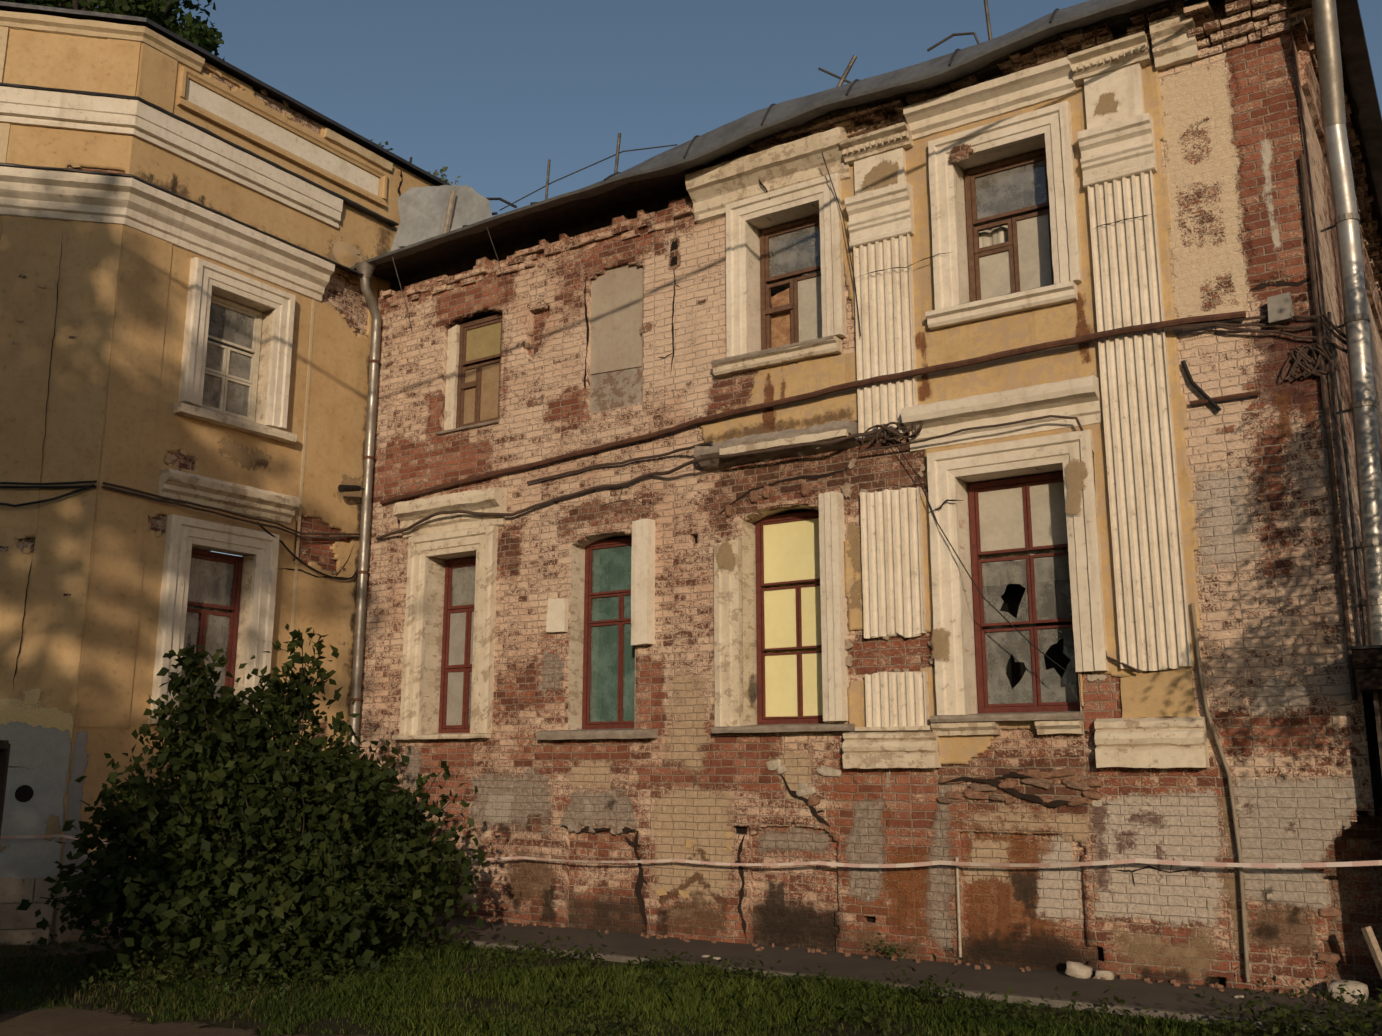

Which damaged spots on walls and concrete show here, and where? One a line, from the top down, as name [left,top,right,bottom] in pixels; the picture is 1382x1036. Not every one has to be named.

flaking render [1225,32,1315,285]
crack [659,268,679,375]
peeling [0,687,73,741]
crack [779,774,830,827]
peeling [521,661,1365,929]
crack [731,834,747,940]
damp [756,881,838,946]